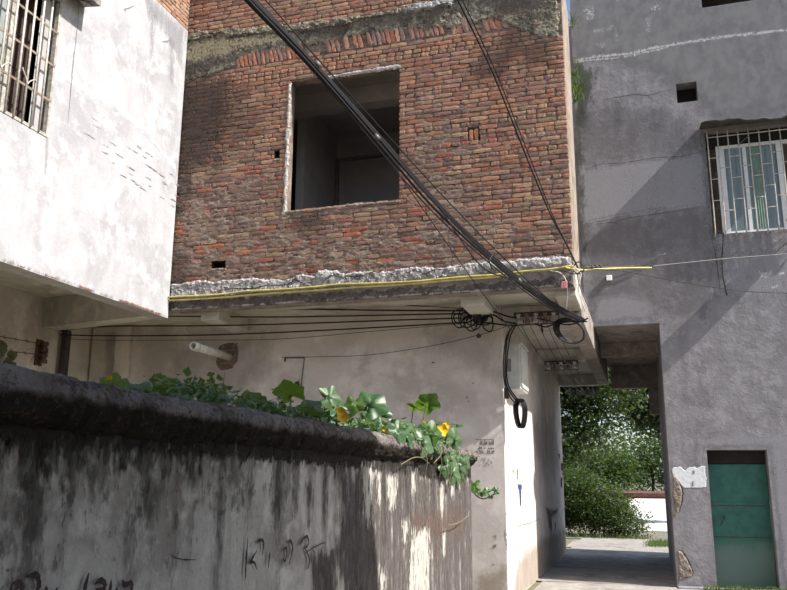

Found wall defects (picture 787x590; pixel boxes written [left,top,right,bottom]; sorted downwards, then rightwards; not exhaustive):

spalling [402,0,454,14]
spalling [315,269,345,279]
flaking render [216,343,238,370]
leakage [0,423,473,590]
peeling [672,466,706,517]
flaking render [677,550,693,583]